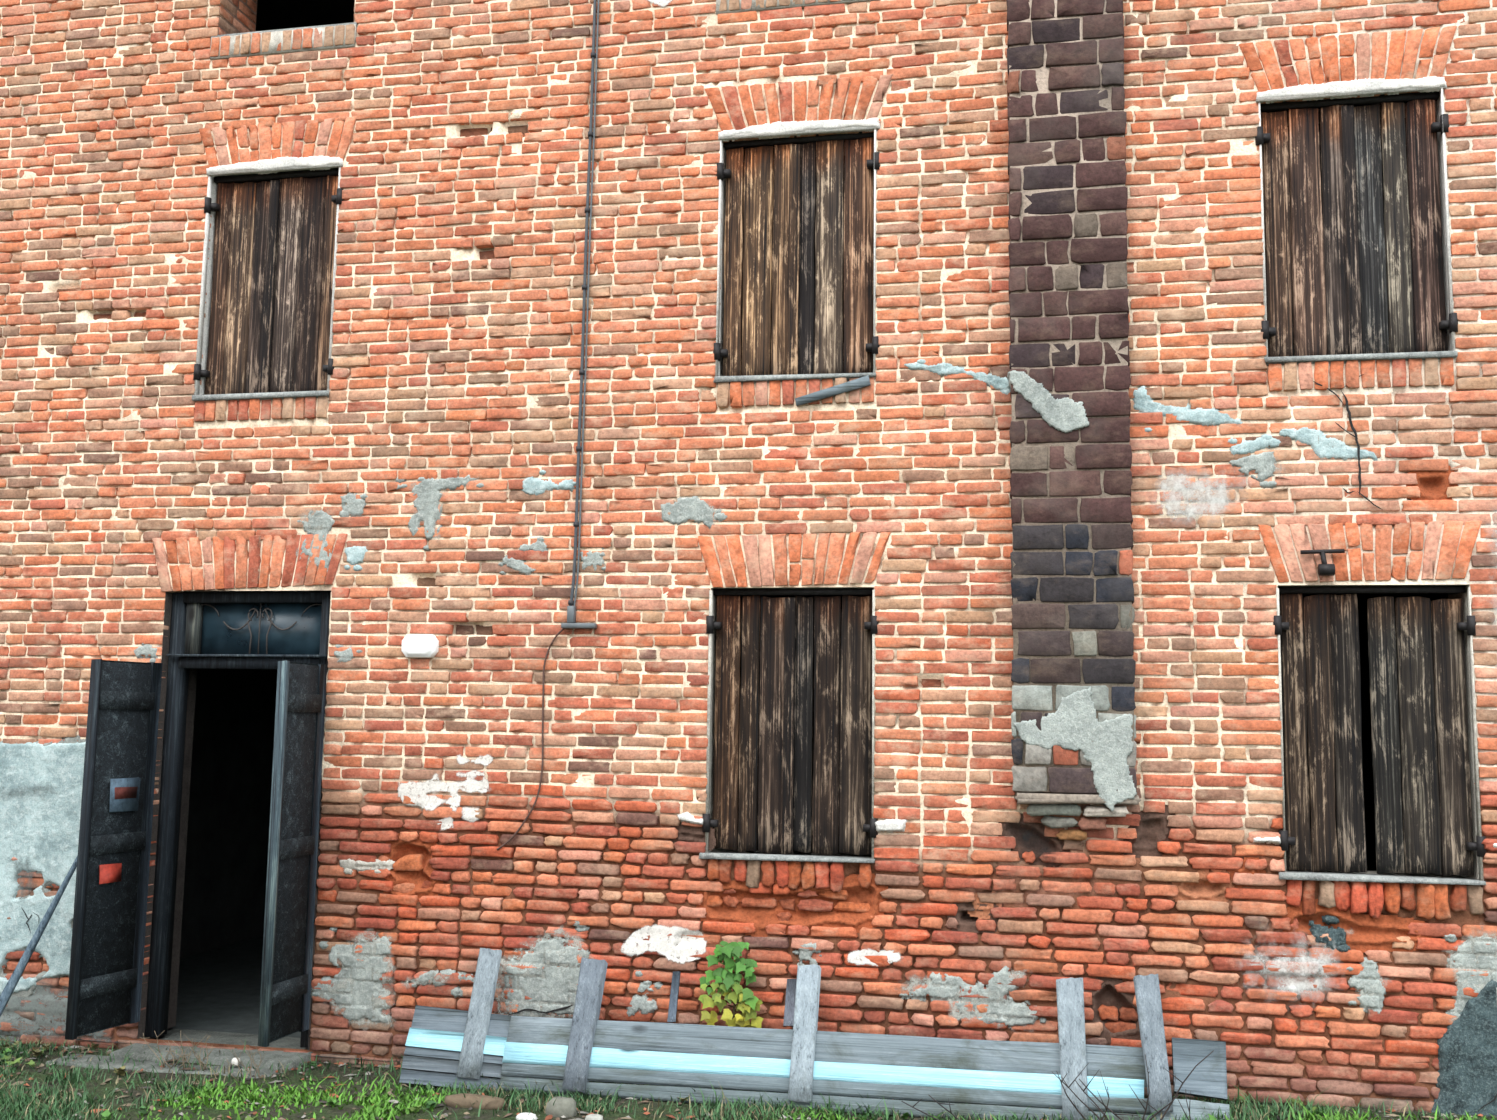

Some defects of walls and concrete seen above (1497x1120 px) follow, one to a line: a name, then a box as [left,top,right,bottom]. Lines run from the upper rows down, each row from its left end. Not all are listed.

peeling [1261,430,1289,449]
crack [1313,374,1383,510]
peeling [714,509,727,522]